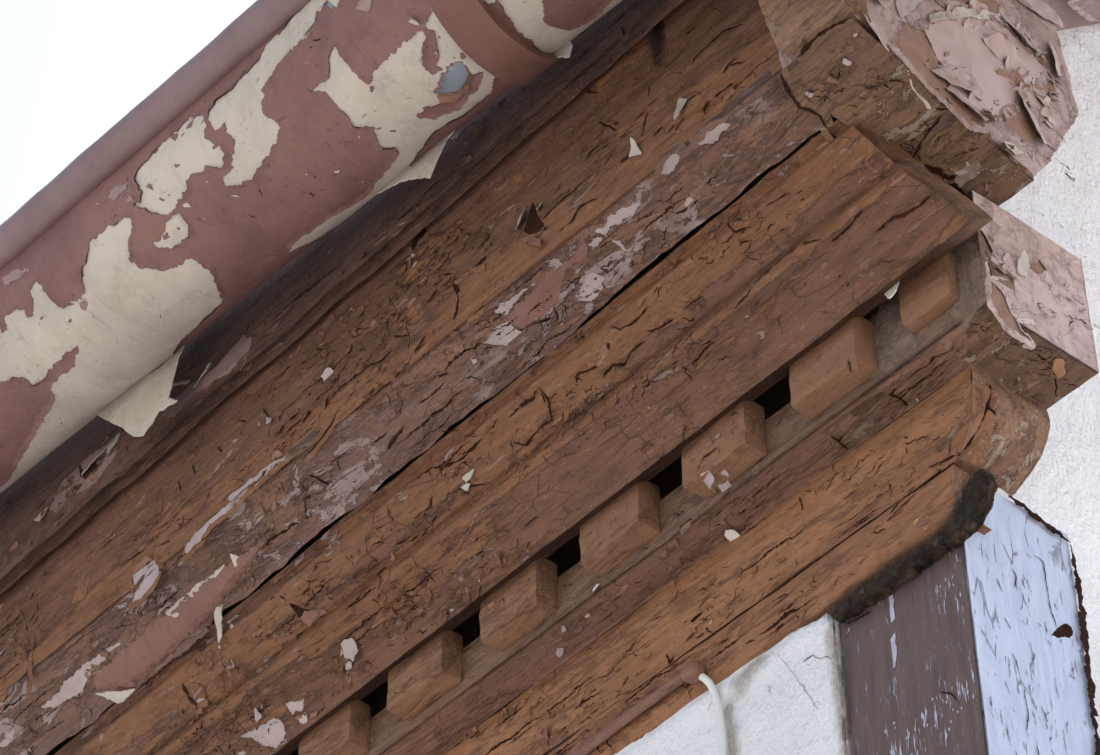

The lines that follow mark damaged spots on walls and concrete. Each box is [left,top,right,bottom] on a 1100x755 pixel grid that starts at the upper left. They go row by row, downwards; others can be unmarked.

peeling [283,2,500,255]
peeling [484,0,623,54]
peeling [862,0,1064,155]
peeling [0,0,372,494]
crack [91,5,1004,702]
peeling [462,194,649,371]
crack [969,302,1091,398]
peeling [38,535,268,713]
crack [129,627,287,755]
crack [781,611,870,755]
mould [828,465,986,617]
crack [979,495,1100,755]